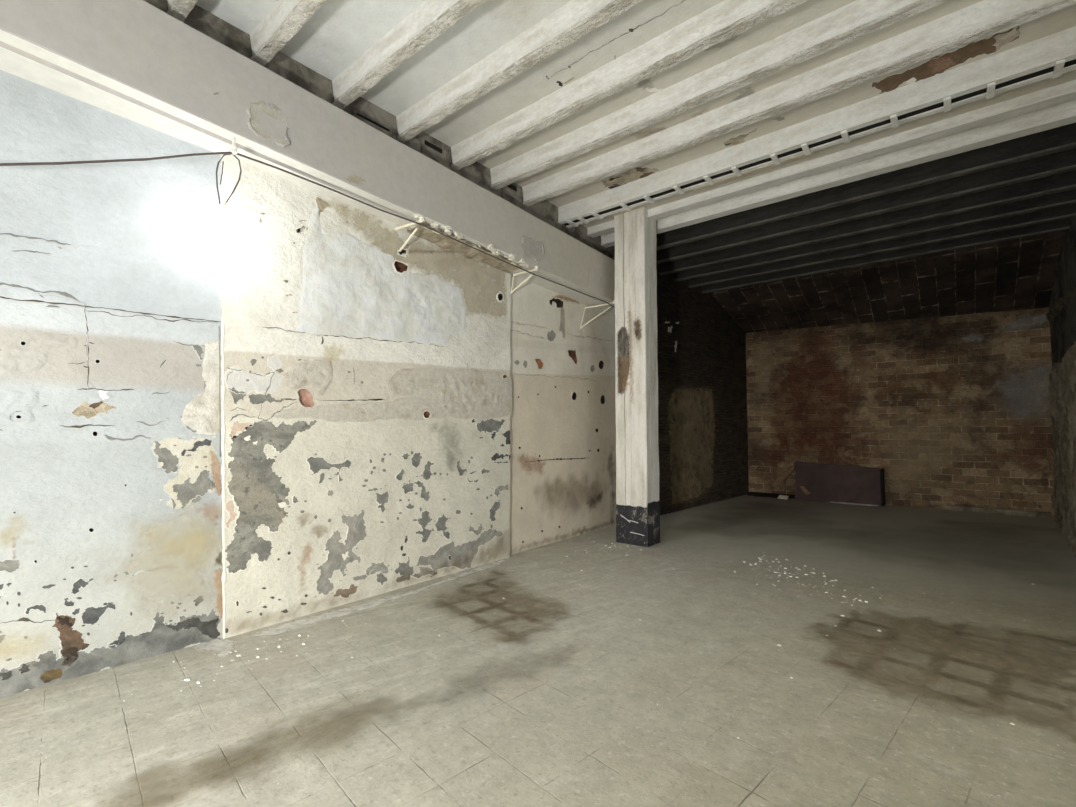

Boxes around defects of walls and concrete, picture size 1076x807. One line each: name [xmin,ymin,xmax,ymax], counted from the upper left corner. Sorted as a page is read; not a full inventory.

crack [546,0,685,80]
flaking render [871,25,1021,94]
peeling [599,167,660,189]
crack [0,233,70,254]
flaking render [392,249,416,276]
flaking render [407,214,529,273]
crack [0,282,221,395]
crack [0,405,197,440]
crack [204,367,299,422]
peeling [222,355,284,404]
peeling [104,388,511,605]
peeling [0,559,229,698]